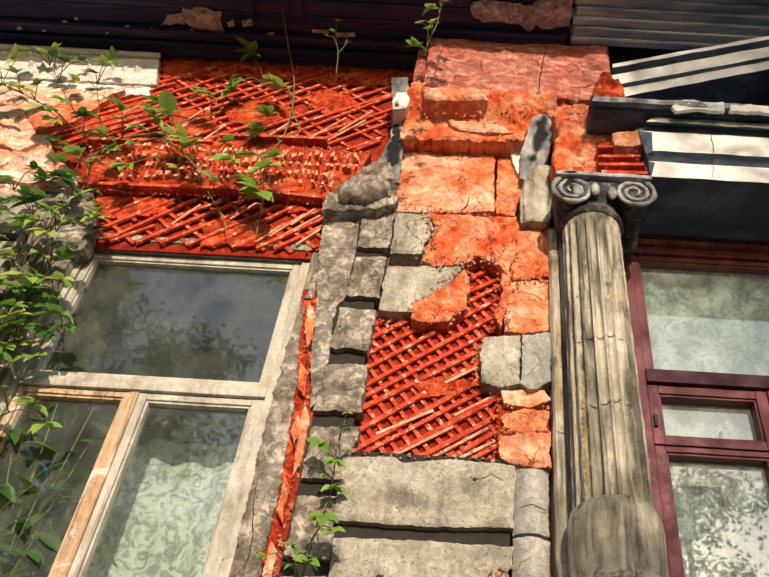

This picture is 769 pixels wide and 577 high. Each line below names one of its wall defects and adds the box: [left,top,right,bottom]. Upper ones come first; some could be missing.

peeling [150,7,253,32]
peeling [470,0,573,32]
peeling [312,29,355,38]
spalling [0,57,648,477]
spalling [480,563,514,577]